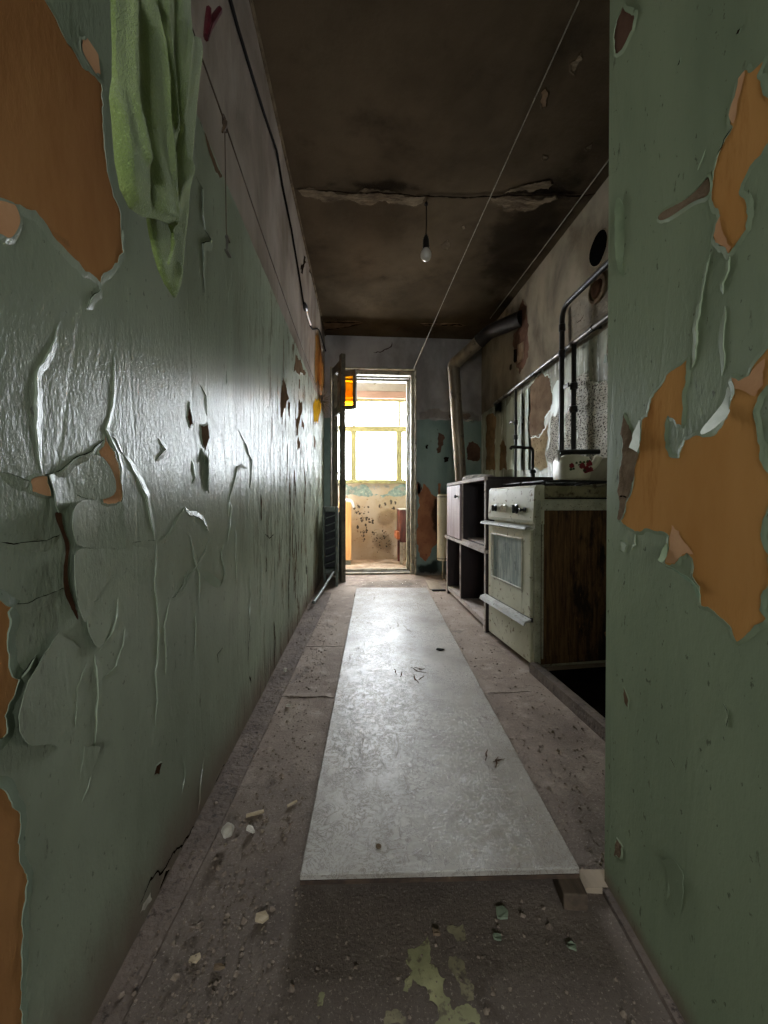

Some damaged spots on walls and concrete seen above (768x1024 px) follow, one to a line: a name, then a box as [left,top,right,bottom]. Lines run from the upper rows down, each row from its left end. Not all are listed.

peeling [613,3,638,58]
peeling [0,0,127,289]
crack [295,179,594,213]
peeling [657,55,768,260]
peeling [186,402,210,492]
peeling [280,353,316,450]
peeling [346,481,441,562]
flaking render [466,370,608,472]
peeling [617,344,768,646]
peeling [0,433,126,750]
peeling [0,776,34,1024]